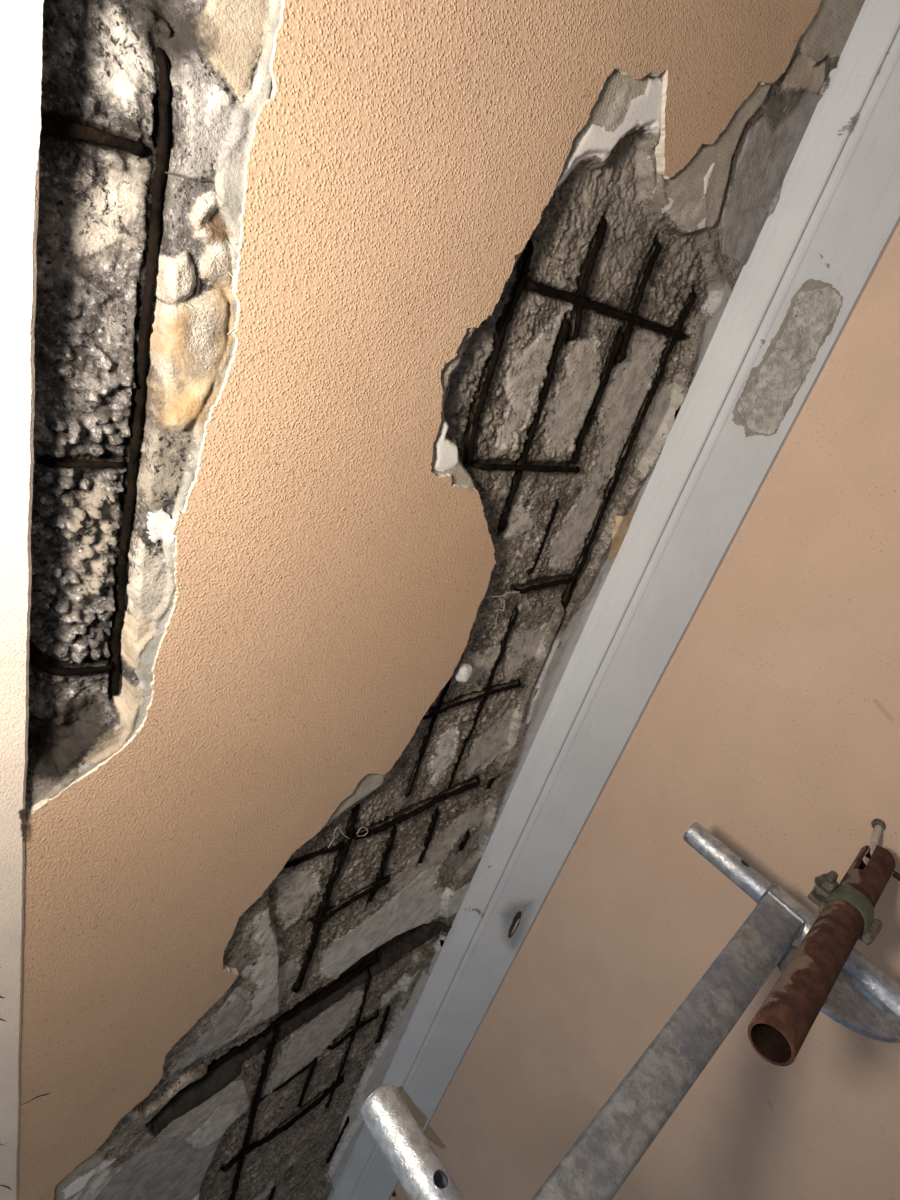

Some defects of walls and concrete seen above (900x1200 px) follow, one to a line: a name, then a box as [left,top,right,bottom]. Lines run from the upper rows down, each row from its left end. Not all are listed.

spalling [19,0,282,843]
peeling [732,279,843,437]